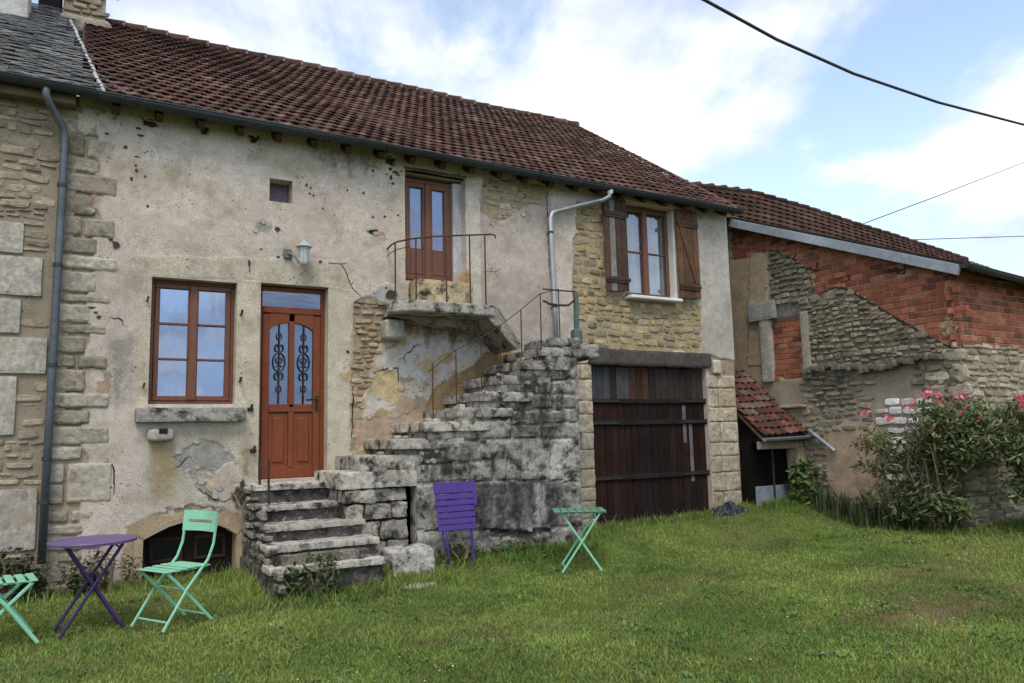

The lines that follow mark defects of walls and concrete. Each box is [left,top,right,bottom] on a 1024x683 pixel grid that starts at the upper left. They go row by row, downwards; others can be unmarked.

peeling [352,349,511,448]
spalling [160,439,245,516]